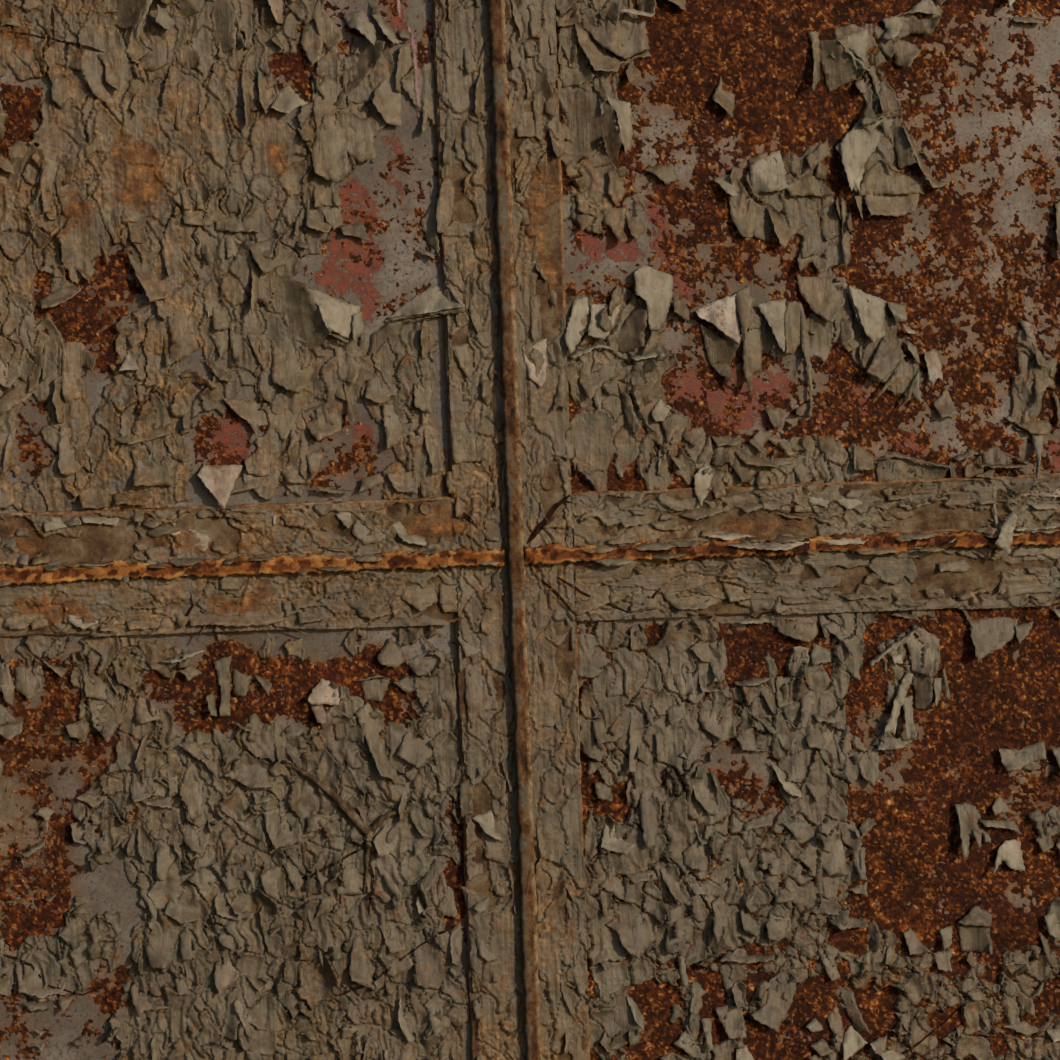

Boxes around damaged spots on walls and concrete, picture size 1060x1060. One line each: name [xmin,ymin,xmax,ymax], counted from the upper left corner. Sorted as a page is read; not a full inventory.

corrosion [300,145,439,317]
corrosion [525,0,1060,493]
corrosion [14,597,93,623]
peeling [0,0,526,1060]
peeling [505,0,1060,1060]
corrosion [0,942,139,1060]
corrosion [0,636,433,954]
corrosion [436,792,467,943]
corrosion [577,605,1060,1060]